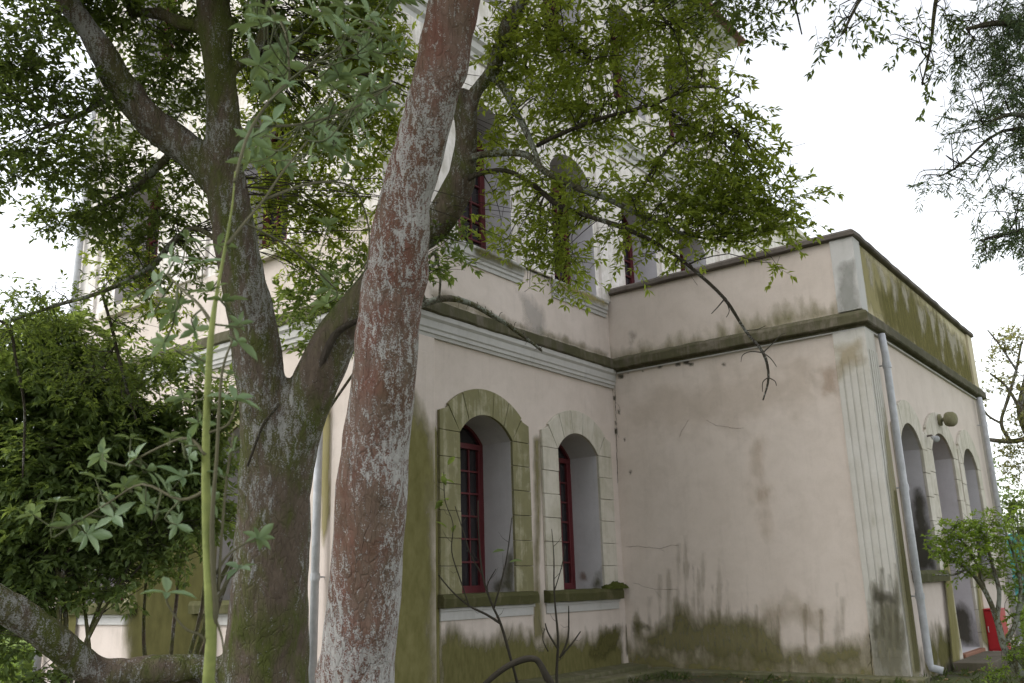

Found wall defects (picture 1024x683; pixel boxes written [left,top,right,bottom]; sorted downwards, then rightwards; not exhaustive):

leakage [867,259,963,359]
leakage [590,626,621,659]
leakage [872,592,904,676]